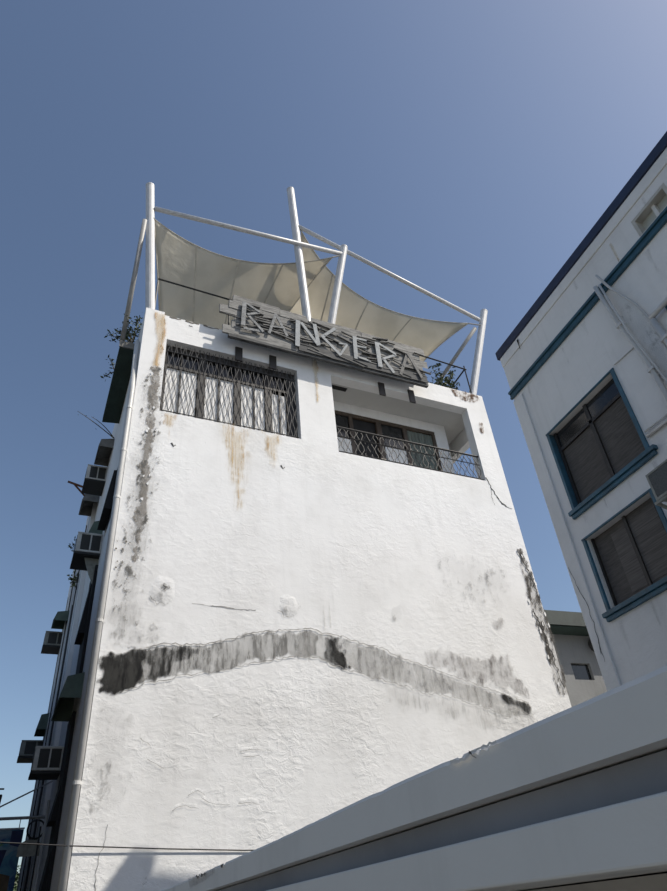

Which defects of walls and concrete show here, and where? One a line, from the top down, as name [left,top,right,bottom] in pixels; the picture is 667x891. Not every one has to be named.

damp [99,628,531,718]